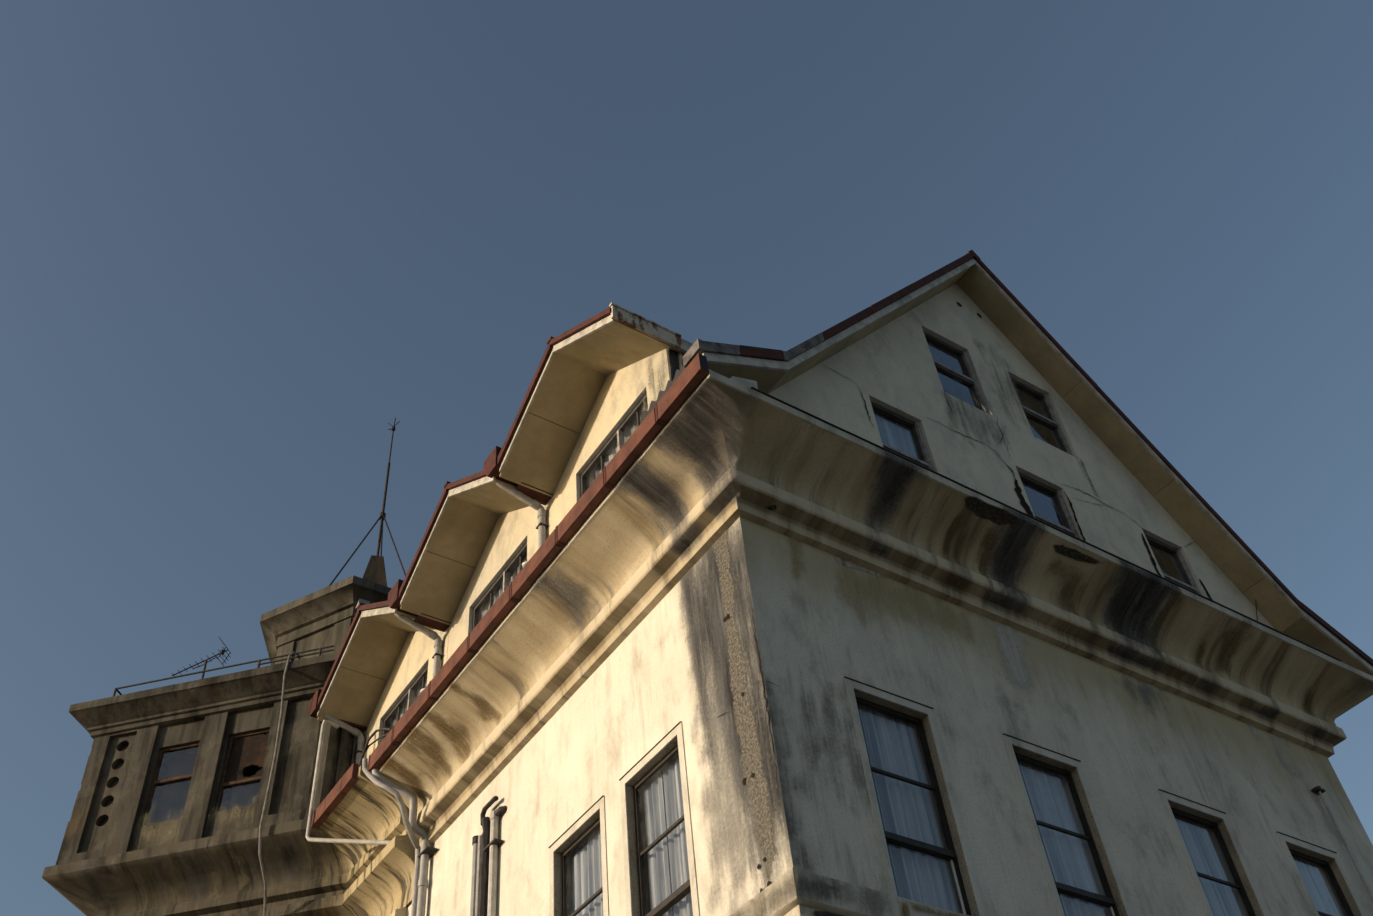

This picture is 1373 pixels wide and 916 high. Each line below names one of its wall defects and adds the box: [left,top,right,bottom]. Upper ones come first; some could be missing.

water stain [867,451,920,557]
crack [932,392,1034,517]
crack [1064,485,1161,576]
water stain [619,377,837,916]
water stain [979,507,1045,689]
water stain [1104,560,1246,705]
water stain [382,756,424,799]
water stain [407,712,471,775]
water stain [450,681,500,720]